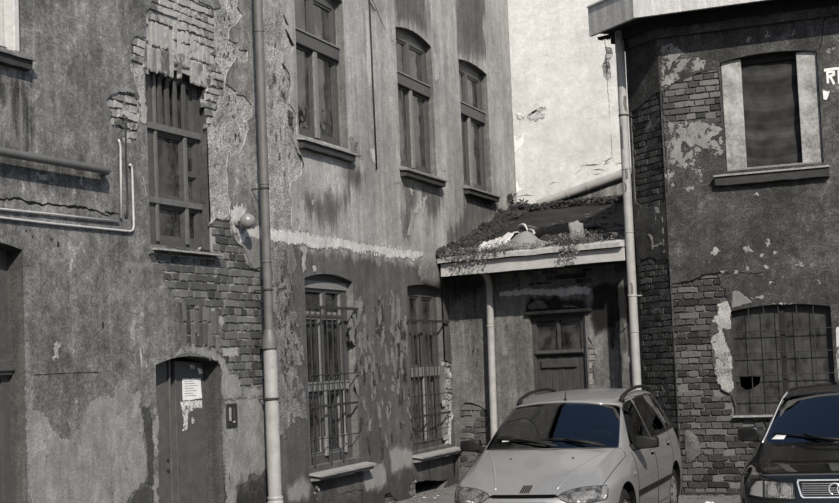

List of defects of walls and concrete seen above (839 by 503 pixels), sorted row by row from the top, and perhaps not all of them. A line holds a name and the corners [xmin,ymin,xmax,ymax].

water stain [13,79,28,134]
flaking render [106,91,140,143]
flaking render [131,0,246,166]
crack [0,196,118,216]
flaking render [620,43,771,492]
flaking render [149,200,317,503]
peeling [348,290,412,503]
flaking render [441,360,491,480]